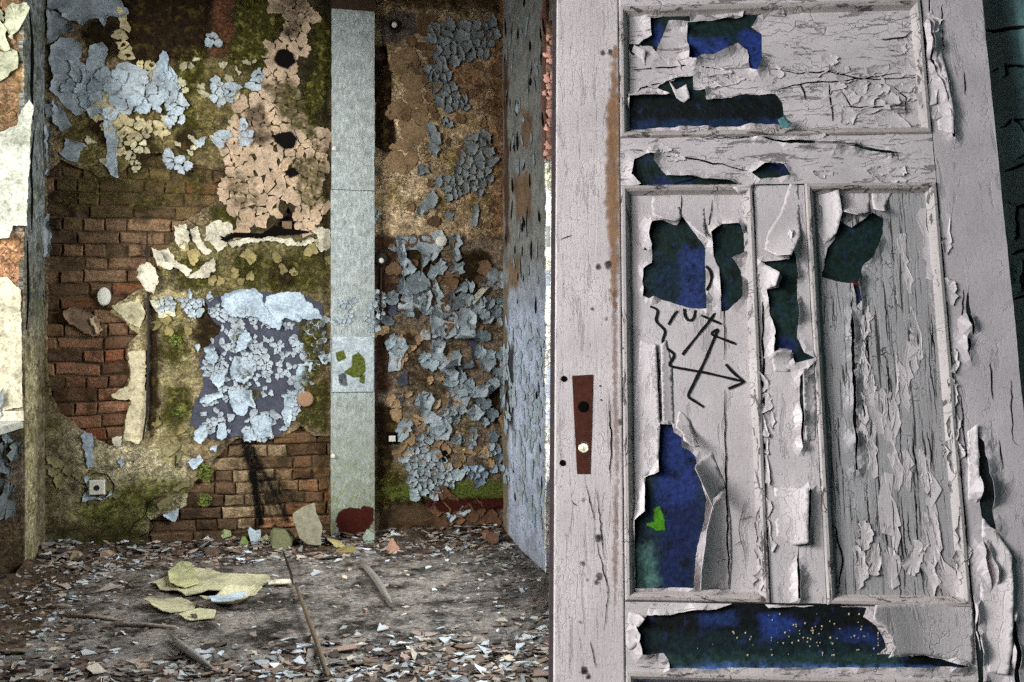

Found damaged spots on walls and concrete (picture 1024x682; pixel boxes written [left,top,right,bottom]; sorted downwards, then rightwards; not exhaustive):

crack [634,65,716,92]
crack [775,69,907,136]
corrosion [605,47,619,306]
crack [630,135,802,214]
spalling [0,0,552,546]
water stain [236,441,296,529]